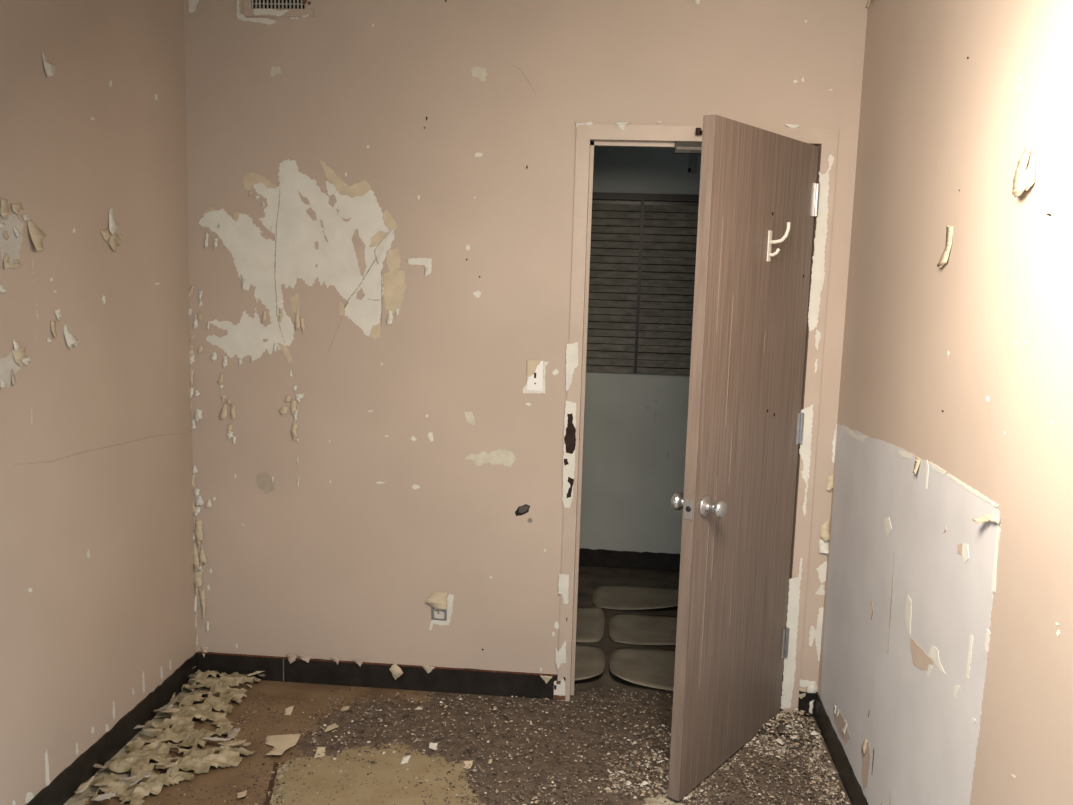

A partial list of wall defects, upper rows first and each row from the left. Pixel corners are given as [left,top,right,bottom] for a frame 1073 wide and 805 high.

peeling [0,198,46,270]
peeling [188,159,432,487]
peeling [808,154,834,373]
peeling [1012,122,1038,198]
peeling [466,449,516,468]
peeling [552,342,579,508]
peeling [799,404,813,516]
peeling [192,465,216,656]
peeling [781,423,1001,805]